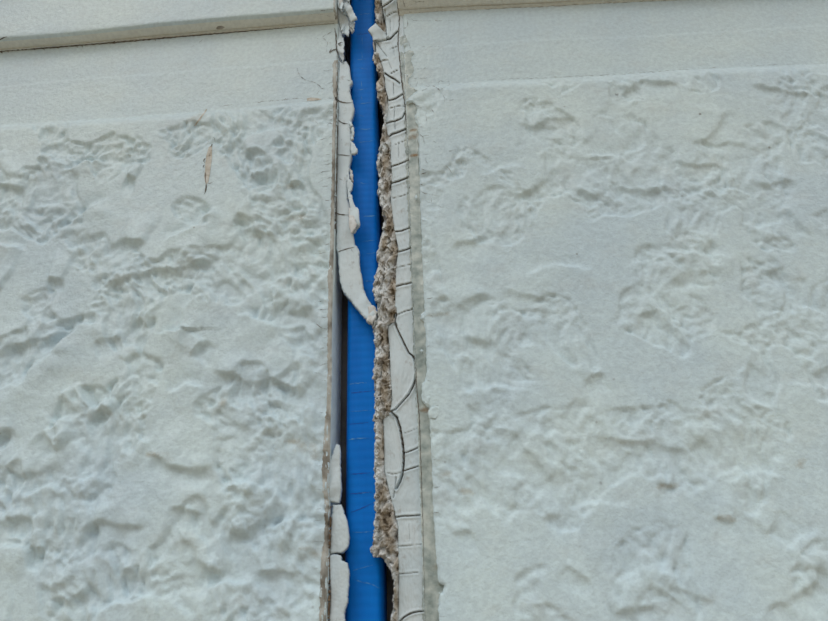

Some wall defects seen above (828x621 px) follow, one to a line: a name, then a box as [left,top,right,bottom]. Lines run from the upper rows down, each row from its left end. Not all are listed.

crack [373,0,452,196]
peeling [319,0,357,621]
crack [392,313,438,517]
crack [400,539,425,621]